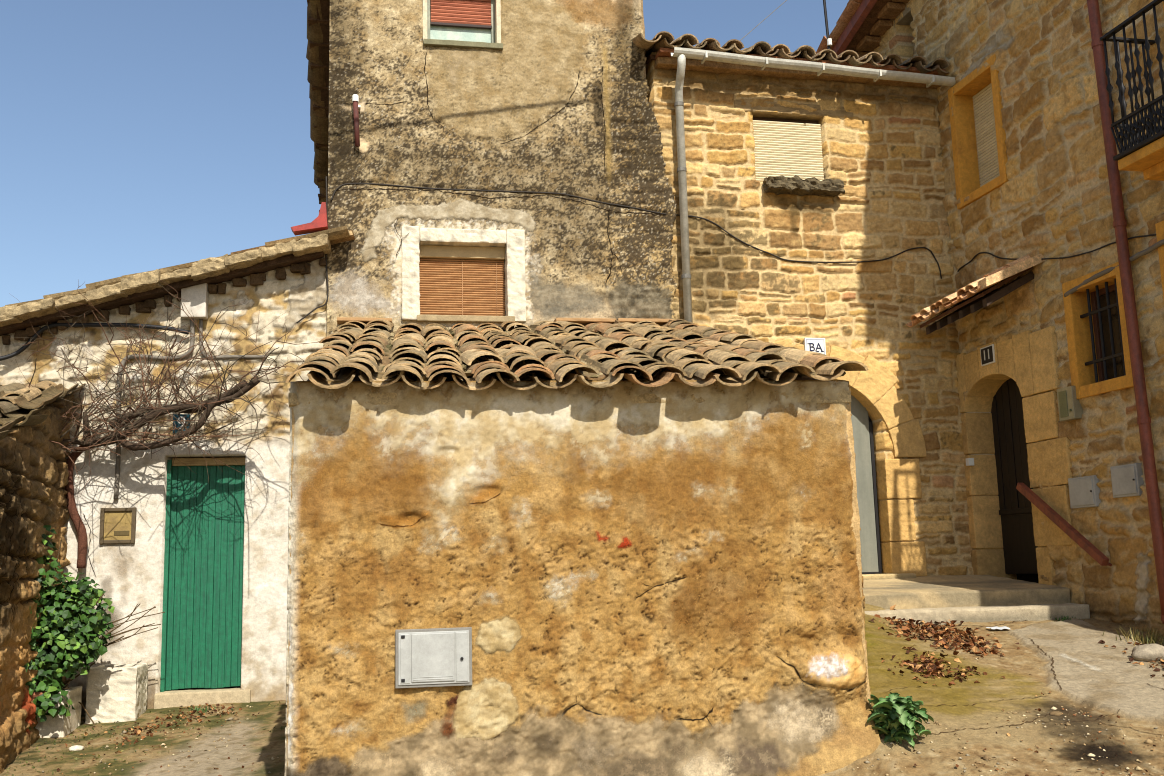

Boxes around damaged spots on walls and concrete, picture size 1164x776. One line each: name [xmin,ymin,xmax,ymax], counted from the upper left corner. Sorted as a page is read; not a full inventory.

water stain [332,273,400,312]
water stain [534,280,675,319]
peeling [291,381,849,543]
flaking render [348,684,837,776]
water stain [286,755,351,776]